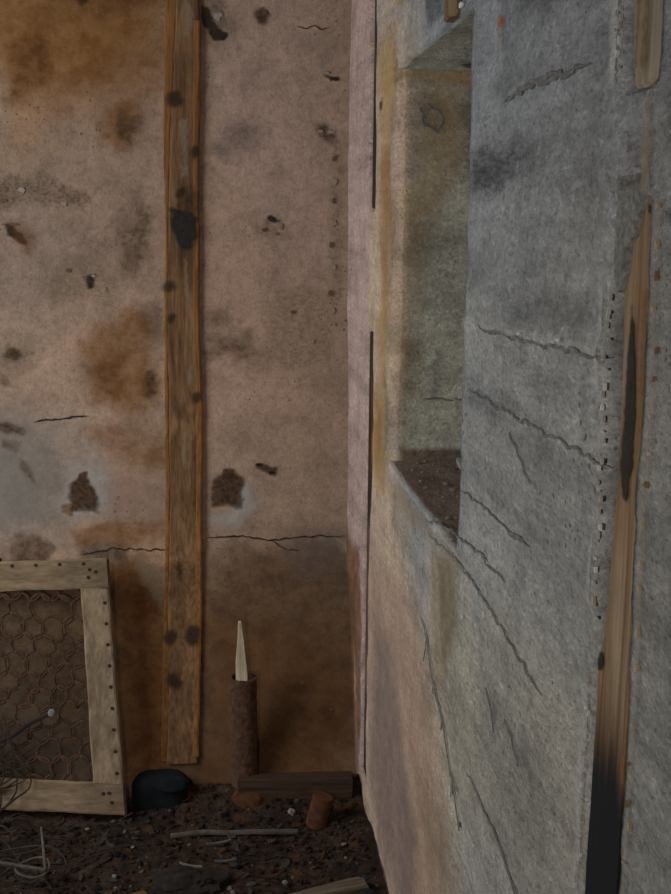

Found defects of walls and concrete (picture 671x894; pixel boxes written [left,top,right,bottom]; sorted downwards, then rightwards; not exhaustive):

spalling [202,6,227,41]
crack [35,414,85,422]
crack [422,385,608,484]
crack [81,547,165,555]
crack [208,534,345,551]
crack [461,490,529,547]
crack [425,519,542,695]
crack [420,617,518,894]